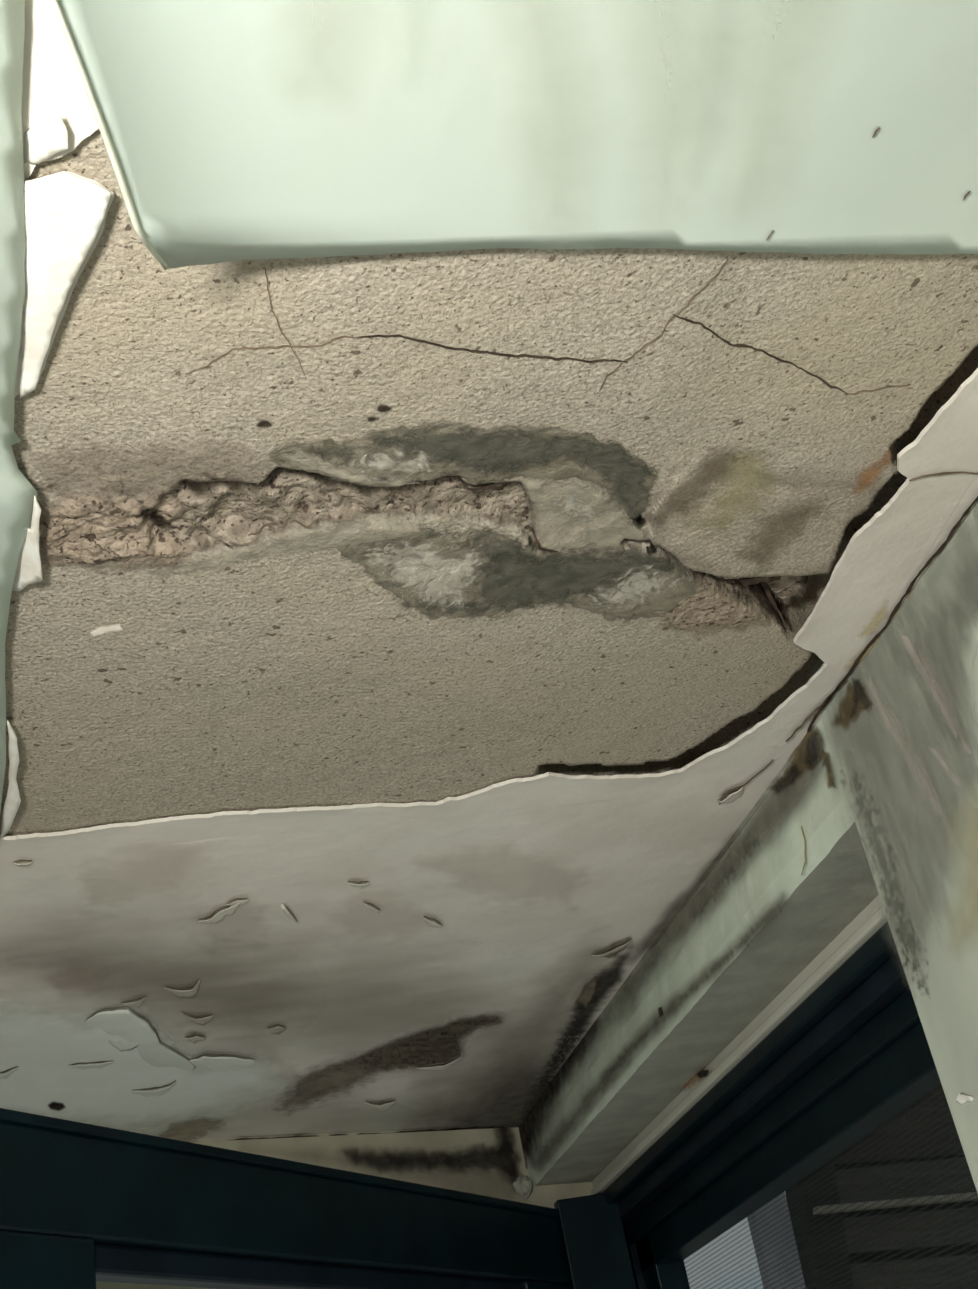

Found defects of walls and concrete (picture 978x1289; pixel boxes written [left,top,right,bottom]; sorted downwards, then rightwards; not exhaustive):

crack [186,259,911,395]
spalling [0,0,978,838]
damp [280,427,730,523]
damp [750,507,816,563]
peeling [198,898,249,924]
damp [346,516,978,1193]
peeling [84,978,256,1097]
peeling [281,1016,502,1110]